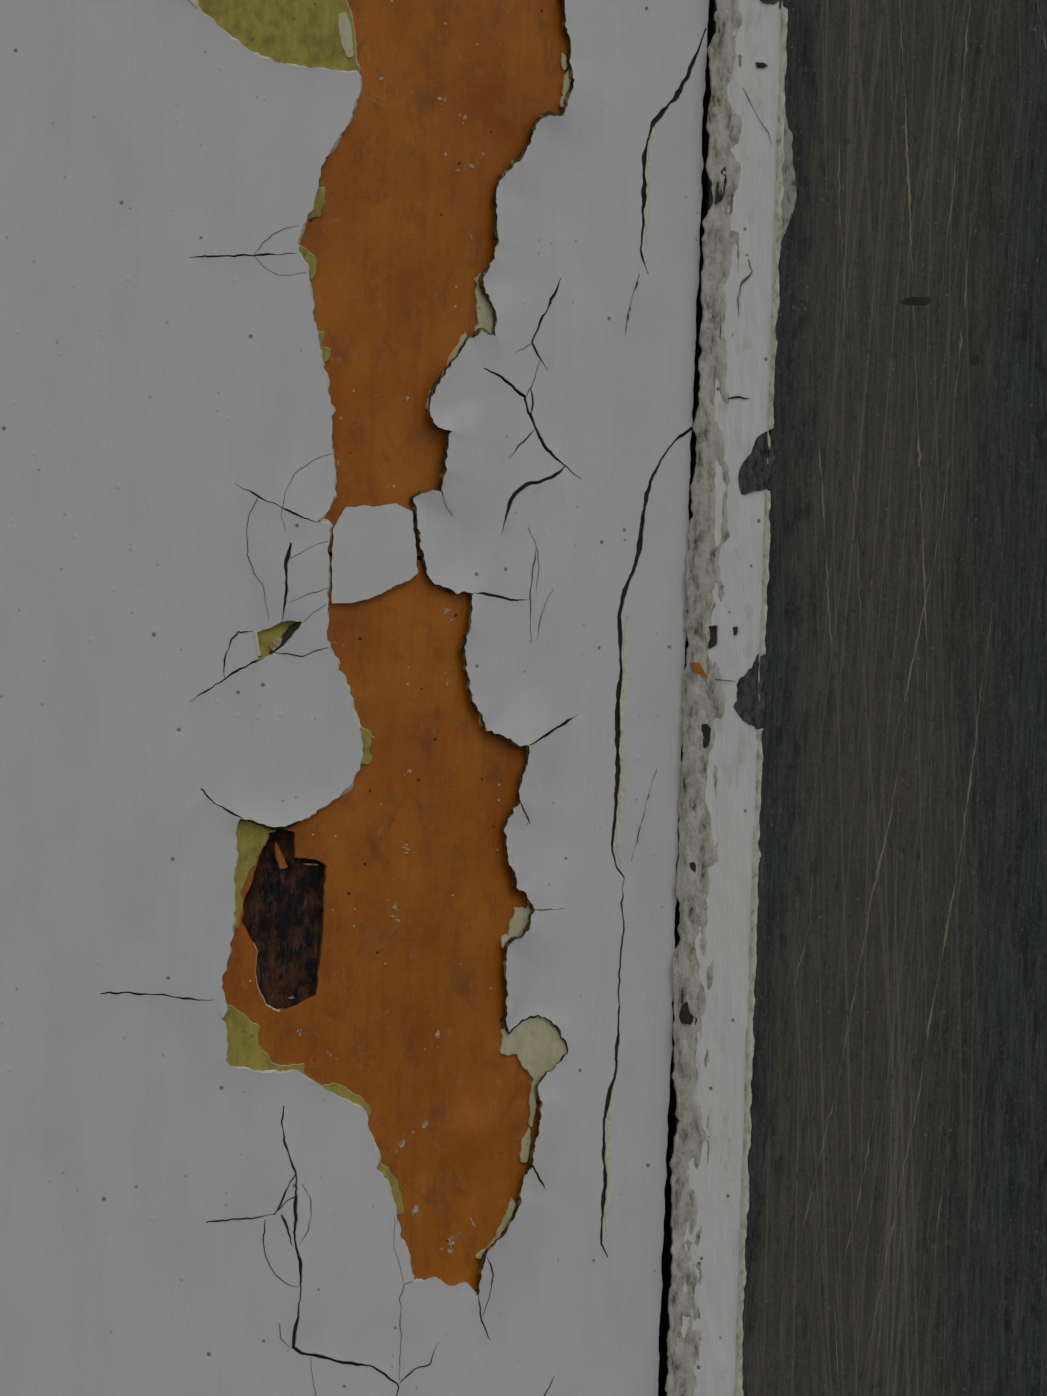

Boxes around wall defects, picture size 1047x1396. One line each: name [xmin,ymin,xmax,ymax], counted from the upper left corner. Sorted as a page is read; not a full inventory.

peeling [760,0,791,9]
crack [190,225,305,276]
crack [626,28,706,329]
crack [195,454,330,698]
peeling [190,0,572,1291]
crack [476,282,579,643]
crack [600,427,692,1257]
spalling [701,724,711,748]
spalling [708,625,738,649]
peeling [733,654,768,729]
peeling [738,431,775,495]
crack [206,1106,439,1395]